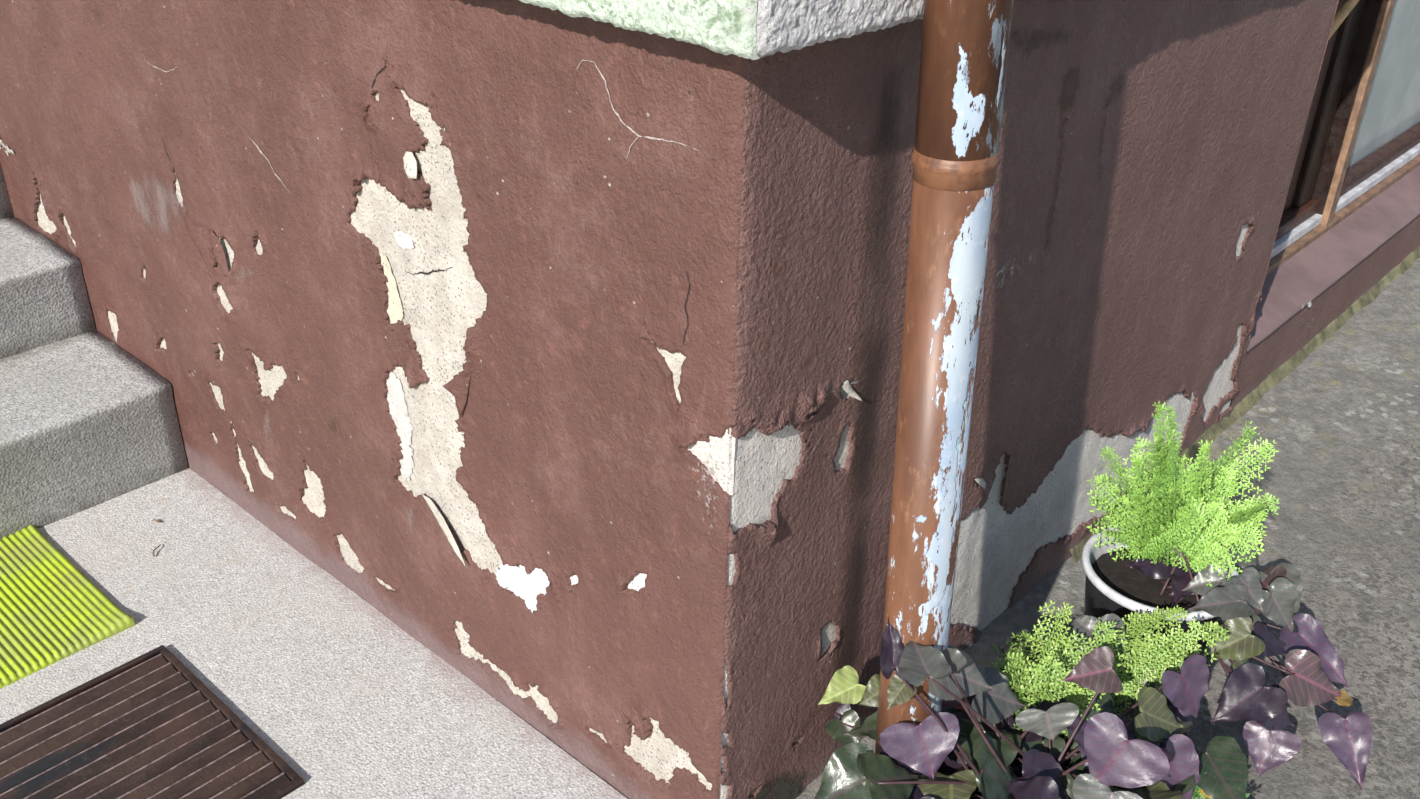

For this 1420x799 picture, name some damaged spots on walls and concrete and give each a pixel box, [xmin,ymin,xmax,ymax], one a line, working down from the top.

crack [577,60,697,157]
peeling [350,90,551,613]
peeling [913,195,1250,631]
peeling [688,425,802,532]
peeling [727,553,736,586]
peeling [454,621,558,723]
peeling [624,718,729,799]